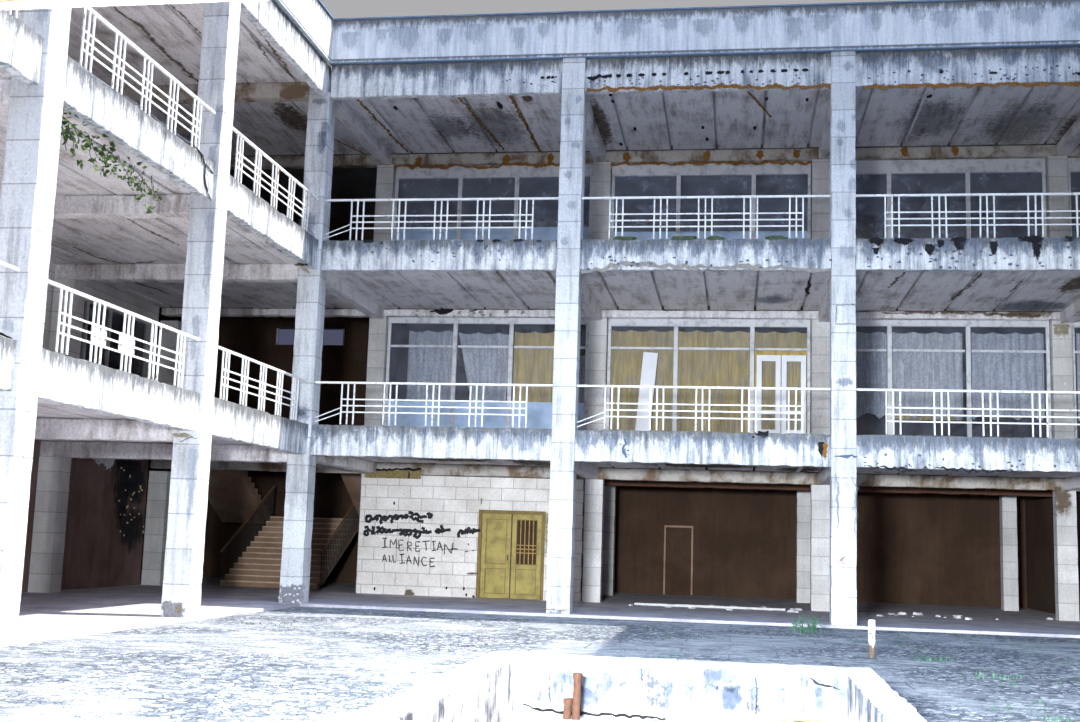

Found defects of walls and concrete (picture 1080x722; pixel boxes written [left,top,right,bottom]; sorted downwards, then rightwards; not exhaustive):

corrosion [587,83,831,117]
corrosion [356,96,560,170]
corrosion [611,149,812,167]
damp [858,435,1080,461]
crack [523,671,665,720]
damp [548,666,883,722]